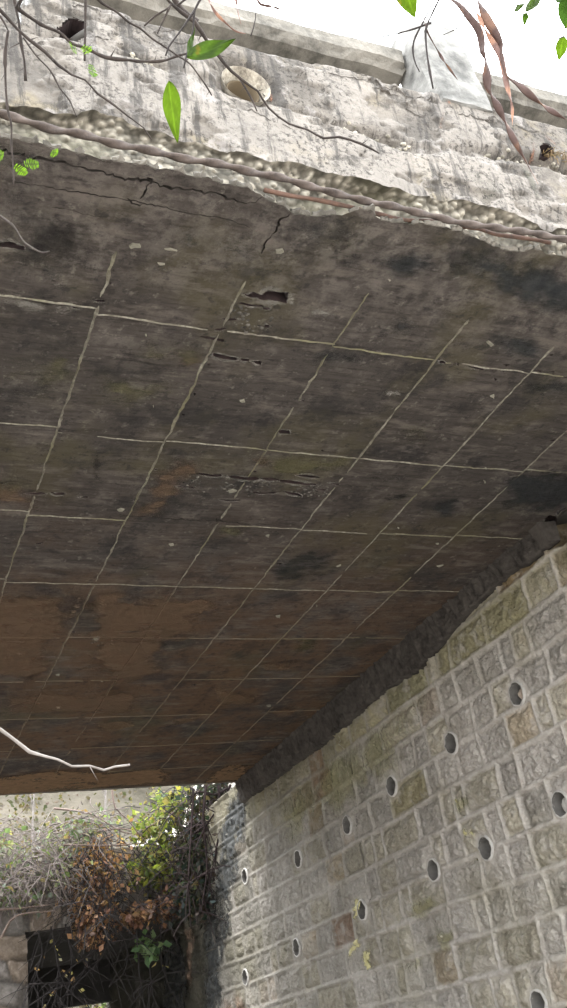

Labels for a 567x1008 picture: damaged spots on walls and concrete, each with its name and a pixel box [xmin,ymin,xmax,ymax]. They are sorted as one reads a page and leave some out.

spalling [221,66,271,107]
crack [1,148,290,254]
spalling [0,102,567,258]
spalling [239,289,289,309]
water stain [390,255,429,274]
water stain [478,262,567,310]
spalling [200,318,262,366]
water stain [505,470,567,512]